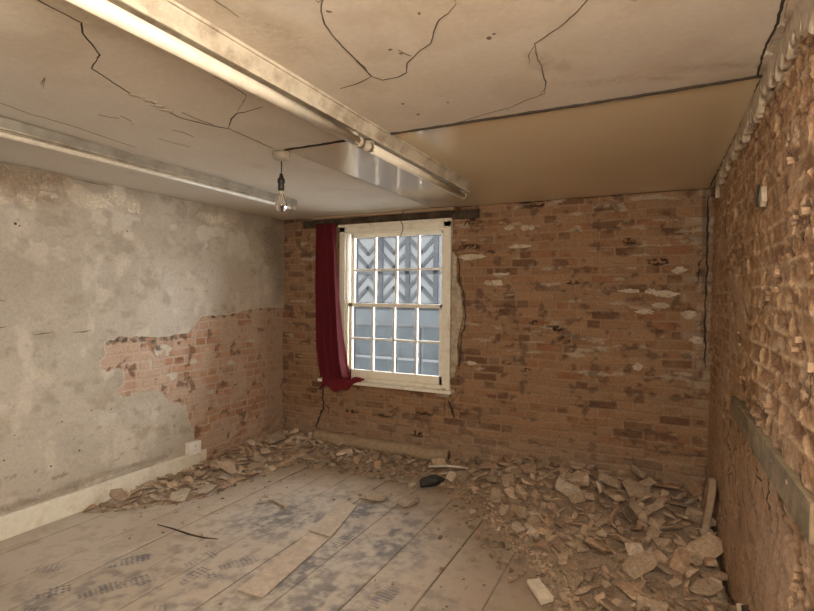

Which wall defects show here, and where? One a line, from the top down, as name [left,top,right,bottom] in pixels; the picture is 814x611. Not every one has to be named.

crack [37,0,347,151]
crack [316,0,456,89]
crack [390,0,798,135]
crack [1,103,134,147]
spalling [785,134,795,165]
crack [697,123,741,368]
spalling [788,206,814,240]
flaking render [99,306,284,460]
spalling [790,337,814,411]